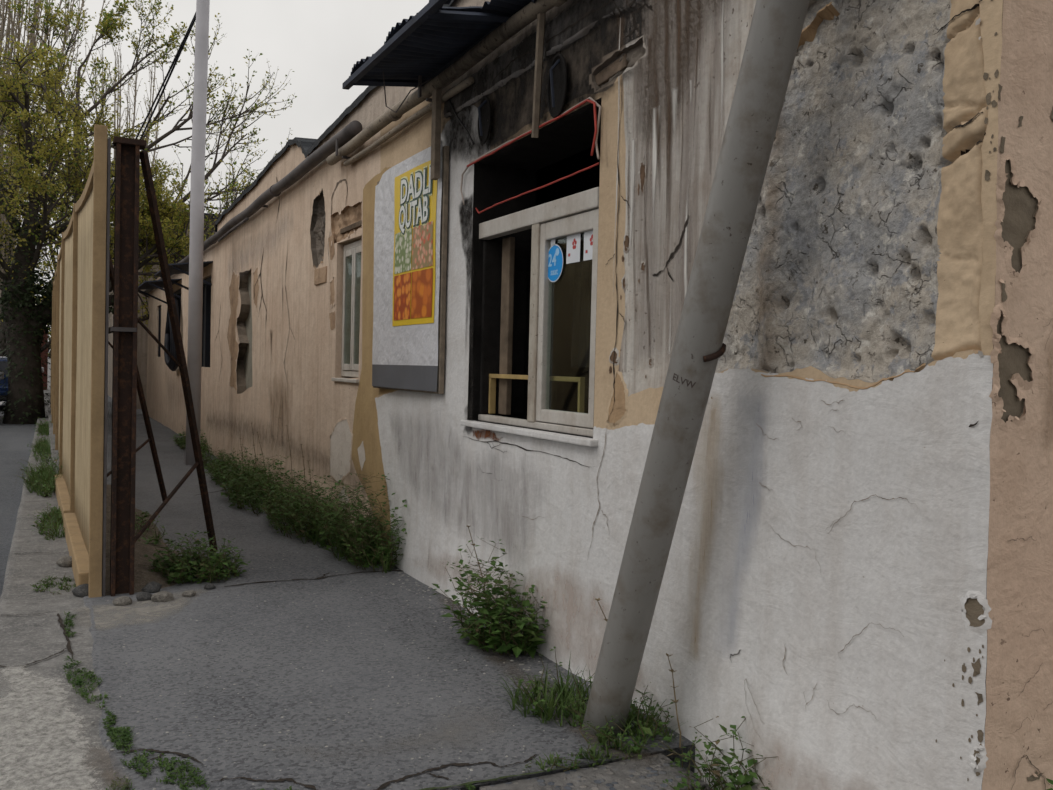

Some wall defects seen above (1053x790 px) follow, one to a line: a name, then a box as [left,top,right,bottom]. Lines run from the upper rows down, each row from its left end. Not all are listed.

spalling [310,189,362,330]
crack [468,83,631,560]
water stain [616,0,701,352]
spalling [715,0,1043,432]
crack [224,570,403,587]
crack [773,495,911,570]
peeling [952,590,992,716]
crack [117,748,317,790]
crack [374,754,595,790]
peeling [960,730,989,781]